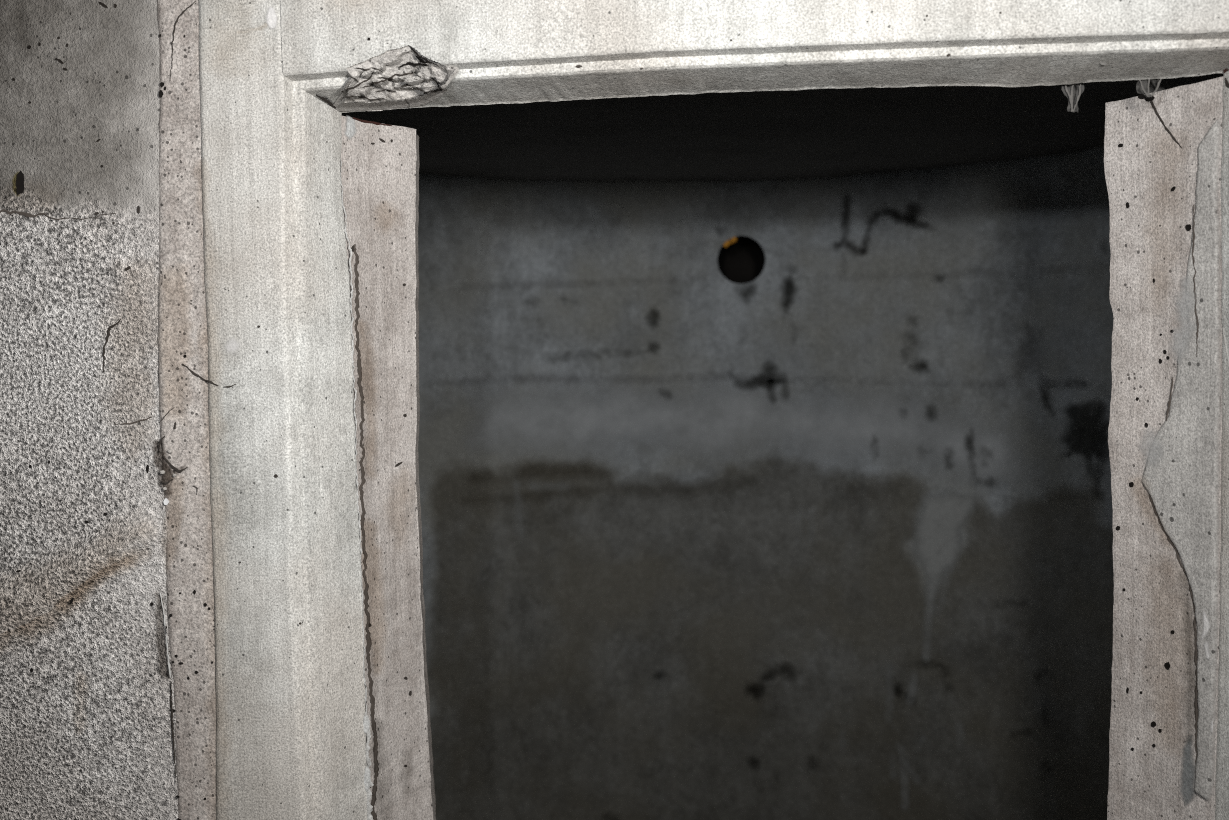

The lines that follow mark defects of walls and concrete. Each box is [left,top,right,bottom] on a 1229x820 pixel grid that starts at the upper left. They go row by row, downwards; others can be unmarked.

spalling [333,45,459,111]
crack [102,319,121,372]
crack [182,355,236,388]
spalling [146,407,188,494]
water stain [1065,401,1111,491]
water stain [915,493,974,629]